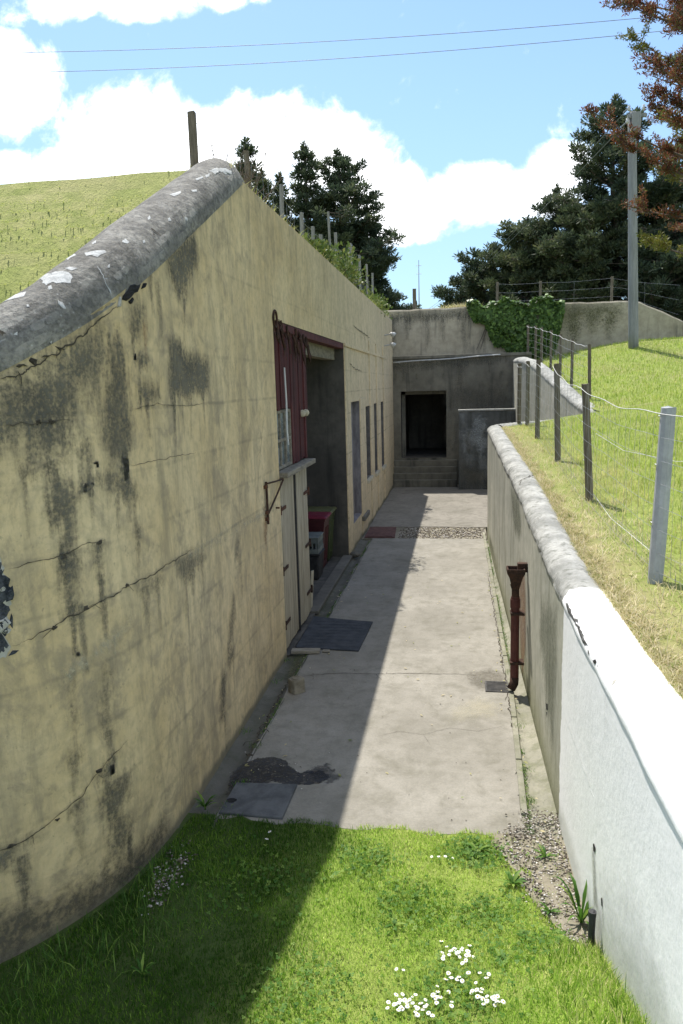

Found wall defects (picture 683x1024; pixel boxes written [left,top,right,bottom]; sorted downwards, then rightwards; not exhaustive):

crack [2,266,116,384]
spalling [117,283,147,308]
leakage [168,233,197,297]
leakage [0,322,209,469]
spalling [0,559,19,658]
crack [10,540,103,575]
leakage [51,447,93,621]
crack [16,550,190,646]
crack [0,744,124,851]